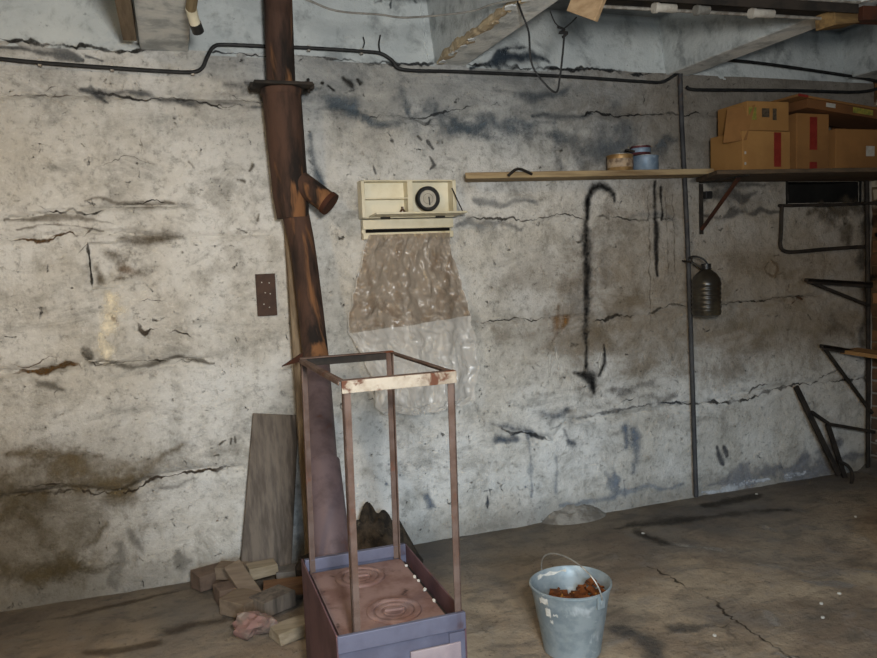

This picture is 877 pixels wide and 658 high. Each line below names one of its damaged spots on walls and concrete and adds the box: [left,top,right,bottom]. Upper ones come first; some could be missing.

crack [512,64,650,77]
crack [102,93,245,109]
crack [418,106,469,126]
crack [584,98,699,118]
water stain [586,182,615,204]
crack [474,213,636,222]
crack [595,303,684,322]
crack [16,356,101,375]
crack [661,370,859,405]
crack [502,428,547,440]
crack [16,467,223,497]
crack [712,604,798,658]